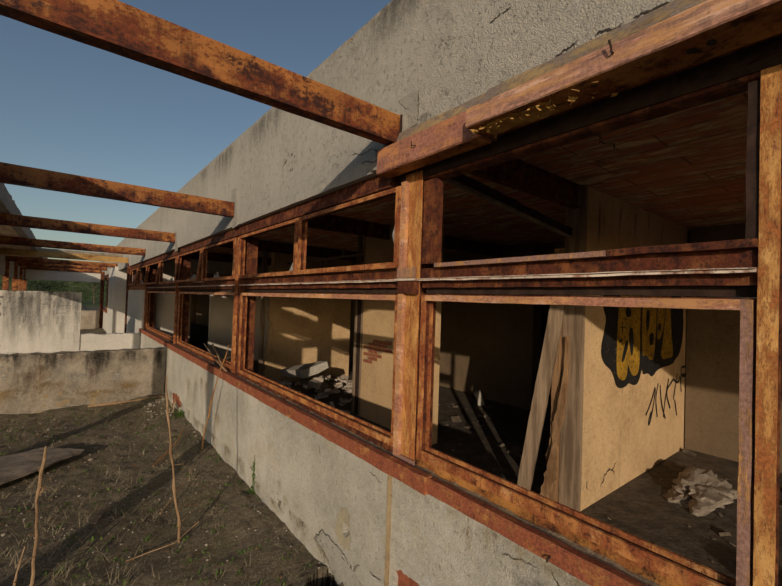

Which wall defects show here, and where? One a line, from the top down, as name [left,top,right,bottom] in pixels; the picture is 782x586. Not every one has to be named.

peeling [470,99,561,138]
leakage [3,291,79,329]
leakage [70,351,111,379]
flaking render [363,340,393,364]
flaking render [396,570,419,586]